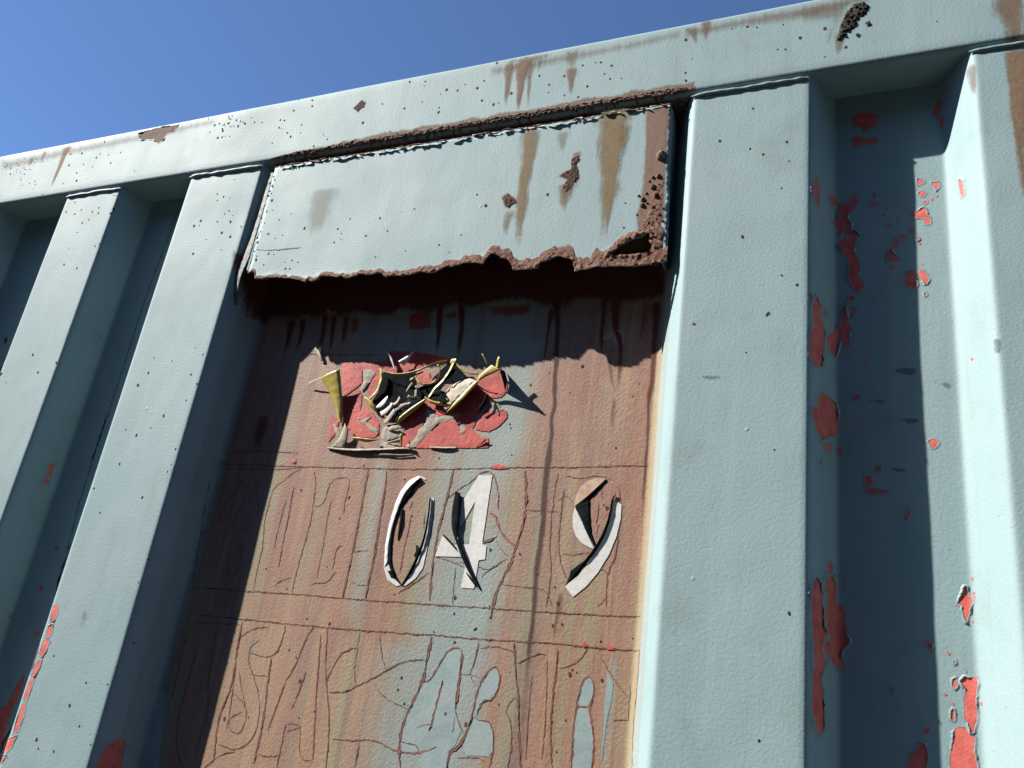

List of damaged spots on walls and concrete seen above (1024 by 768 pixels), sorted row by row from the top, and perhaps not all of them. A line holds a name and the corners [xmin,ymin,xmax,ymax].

corrosion [836,1,872,41]
corrosion [138,124,179,144]
peeling [795,174,941,369]
peeling [364,351,469,416]
corrosion [234,57,696,668]
peeling [0,584,59,764]
crack [168,451,647,768]
peeling [384,454,512,600]
peeling [554,478,621,597]
peeling [807,560,852,738]
peeling [943,652,982,768]
peeling [955,577,975,625]